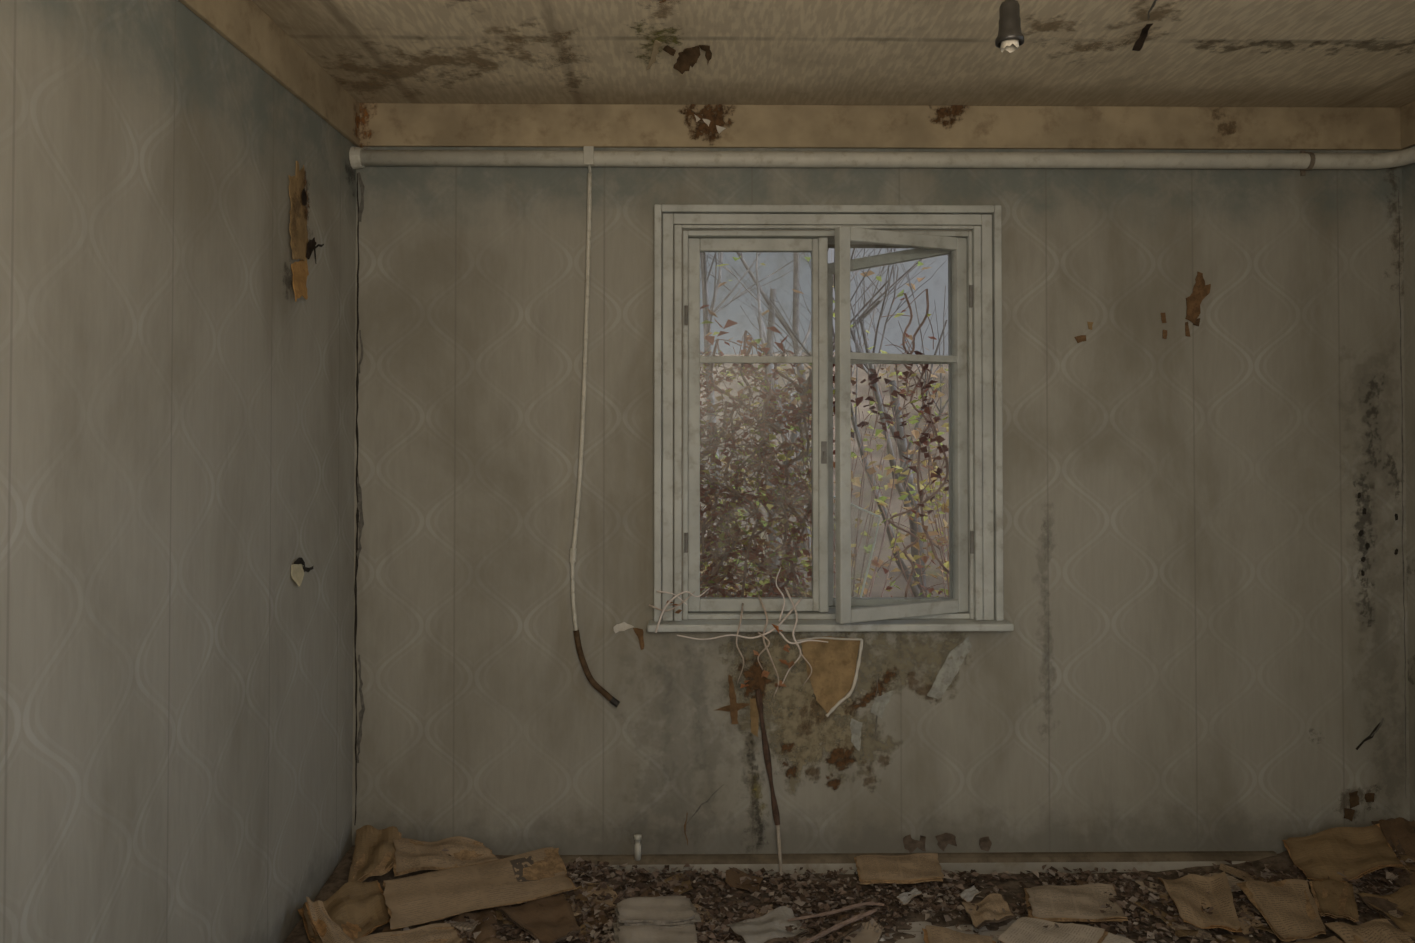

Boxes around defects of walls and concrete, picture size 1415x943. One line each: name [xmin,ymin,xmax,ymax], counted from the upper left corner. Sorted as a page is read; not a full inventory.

leakage [339,30,543,91]
leakage [631,0,712,74]
leakage [1032,21,1102,51]
leakage [680,104,734,145]
leakage [930,105,966,128]
peeling [291,260,309,302]
leakage [1357,492,1370,576]
peeling [721,631,972,792]